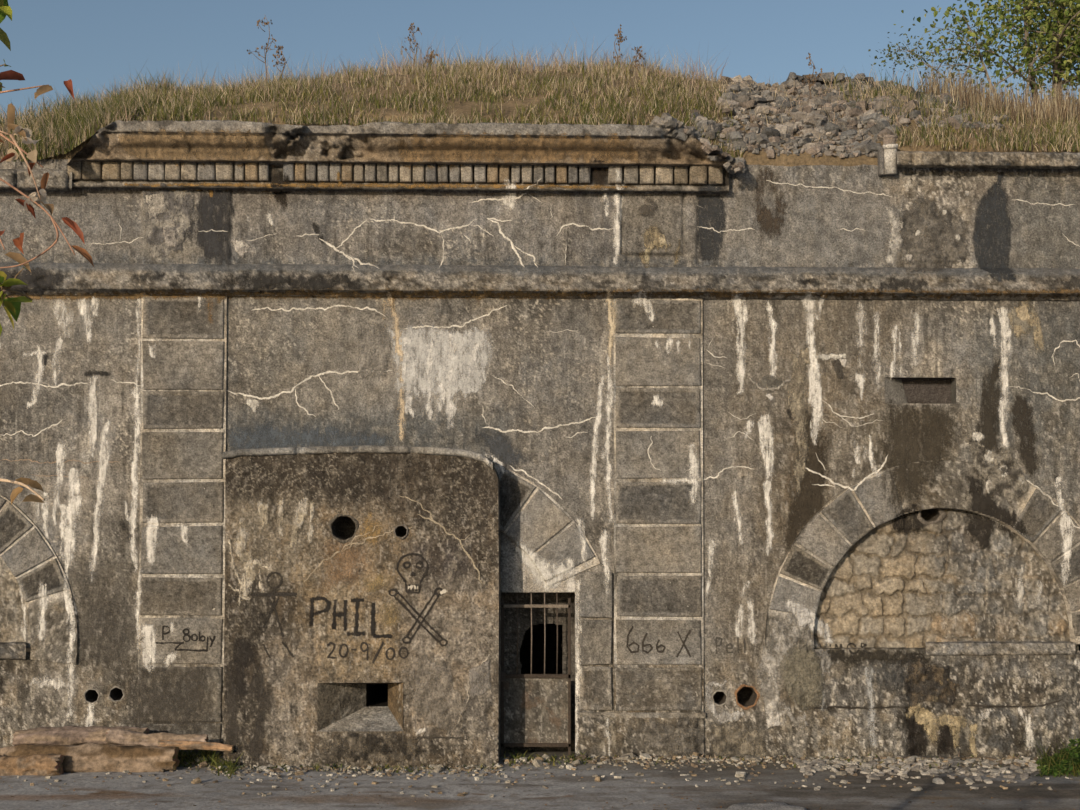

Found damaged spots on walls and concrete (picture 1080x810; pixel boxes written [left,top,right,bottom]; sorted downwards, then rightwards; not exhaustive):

crack [198,178,613,270]
crack [226,369,392,417]
water stain [226,292,525,472]
water stain [732,295,748,393]
water stain [745,276,830,556]
water stain [855,302,920,399]
water stain [976,307,1039,476]
water stain [31,299,270,761]
crack [304,496,483,585]
crack [511,466,562,499]
crack [805,454,888,491]
water stain [20,583,50,641]